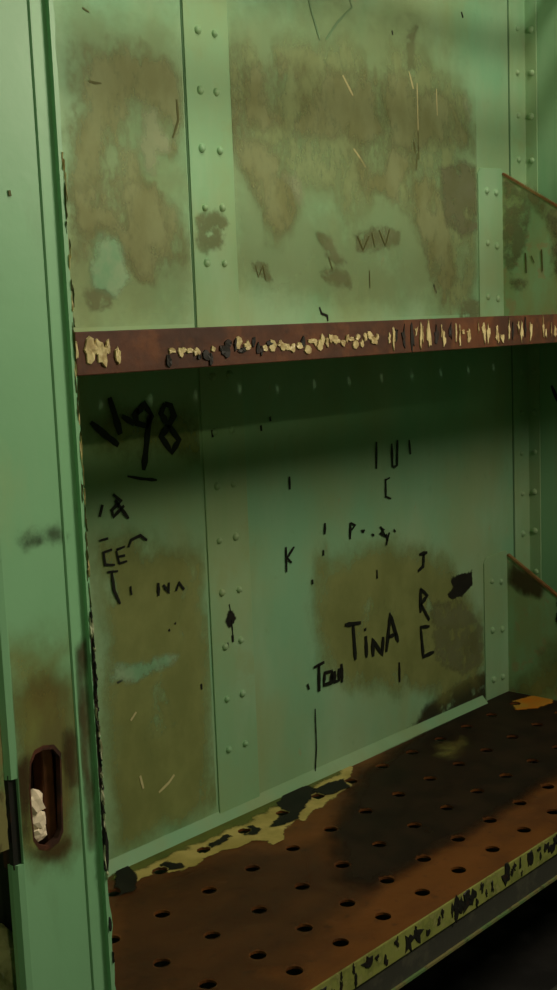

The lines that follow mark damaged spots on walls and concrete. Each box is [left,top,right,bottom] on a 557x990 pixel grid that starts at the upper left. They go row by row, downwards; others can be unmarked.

peeling [503,181,557,288]
peeling [166,317,557,368]
peeling [61,152,353,895]
rust [14,643,93,858]
peeling [394,834,557,953]
peeling [320,954,388,990]